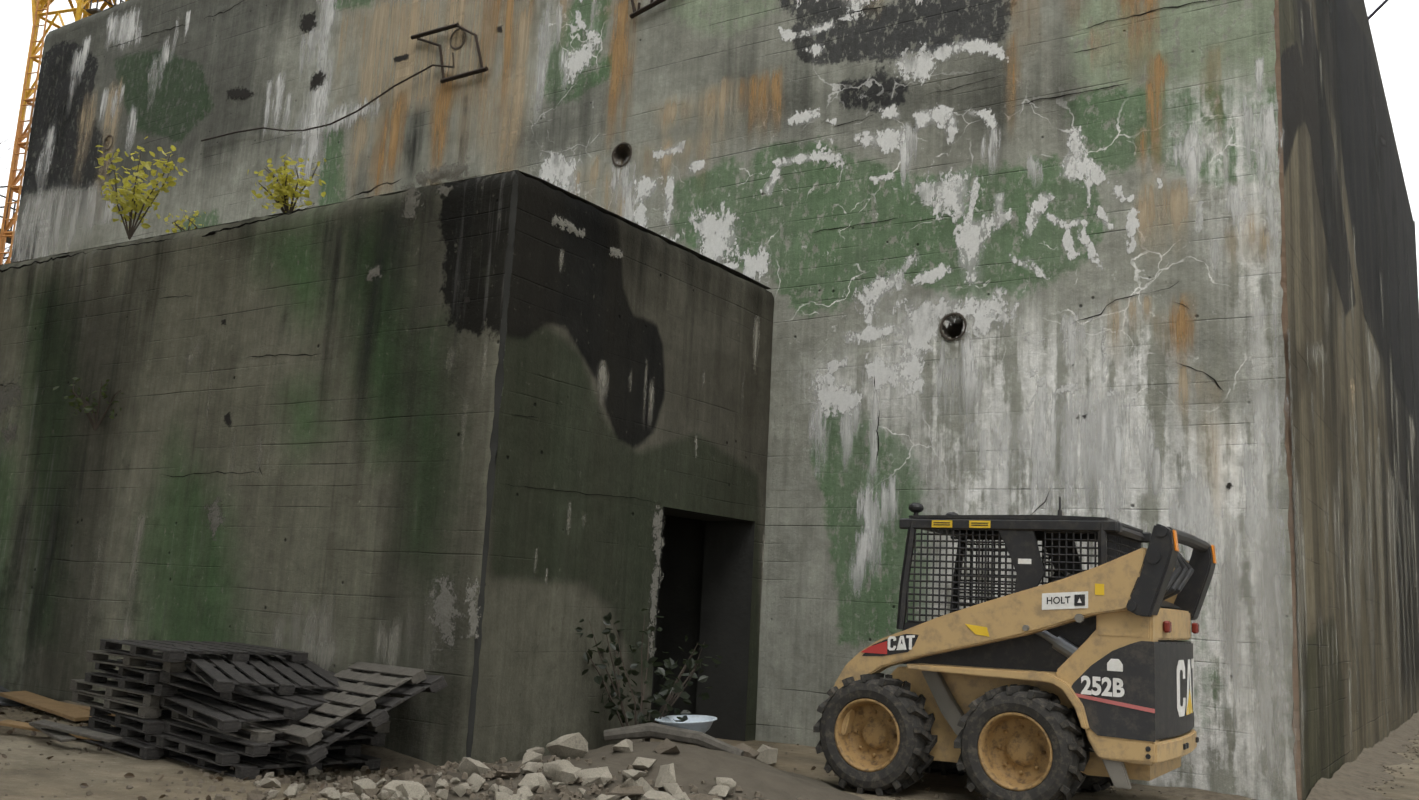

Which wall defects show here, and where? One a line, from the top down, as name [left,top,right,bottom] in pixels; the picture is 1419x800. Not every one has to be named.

corrosion [361,0,530,185]
damp [611,164,636,221]
damp [900,125,918,176]
damp [981,130,1000,163]
damp [1324,331,1418,609]
spalling [647,505,665,664]